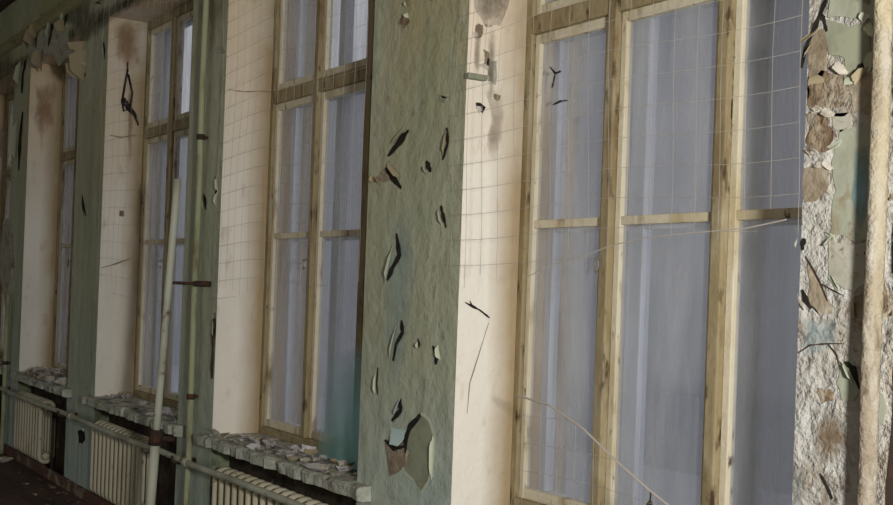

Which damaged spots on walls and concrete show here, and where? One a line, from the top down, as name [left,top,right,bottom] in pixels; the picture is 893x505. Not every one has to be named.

peeling [13,12,88,93]
peeling [369,124,409,189]
peeling [797,0,874,331]
peeling [384,233,401,282]
flaking render [882,226,893,320]
peeling [817,361,860,404]
flaking render [385,398,435,492]
flaking render [879,394,893,505]